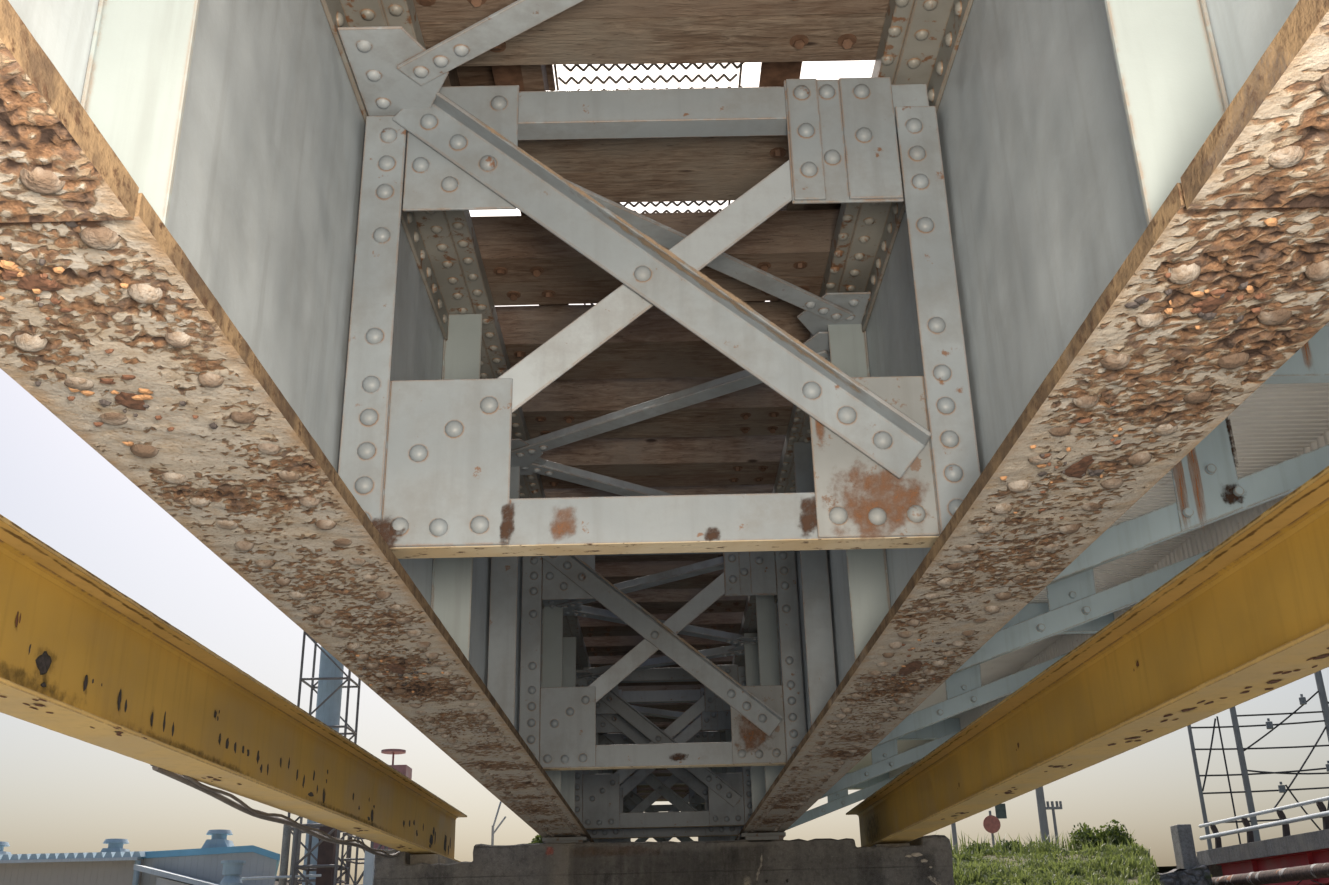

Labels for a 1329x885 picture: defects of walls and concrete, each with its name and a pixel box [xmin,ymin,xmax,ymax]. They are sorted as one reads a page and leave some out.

peeling [0,259,74,321]
peeling [1125,296,1149,309]
peeling [1190,282,1267,331]
peeling [67,375,174,431]
corrosion [500,505,514,542]
corrosion [551,510,574,538]
corrosion [800,498,817,535]
corrosion [845,470,920,537]
peeling [23,644,53,714]
peeling [1108,647,1329,746]
peeling [214,710,328,803]
corrosion [740,716,767,749]